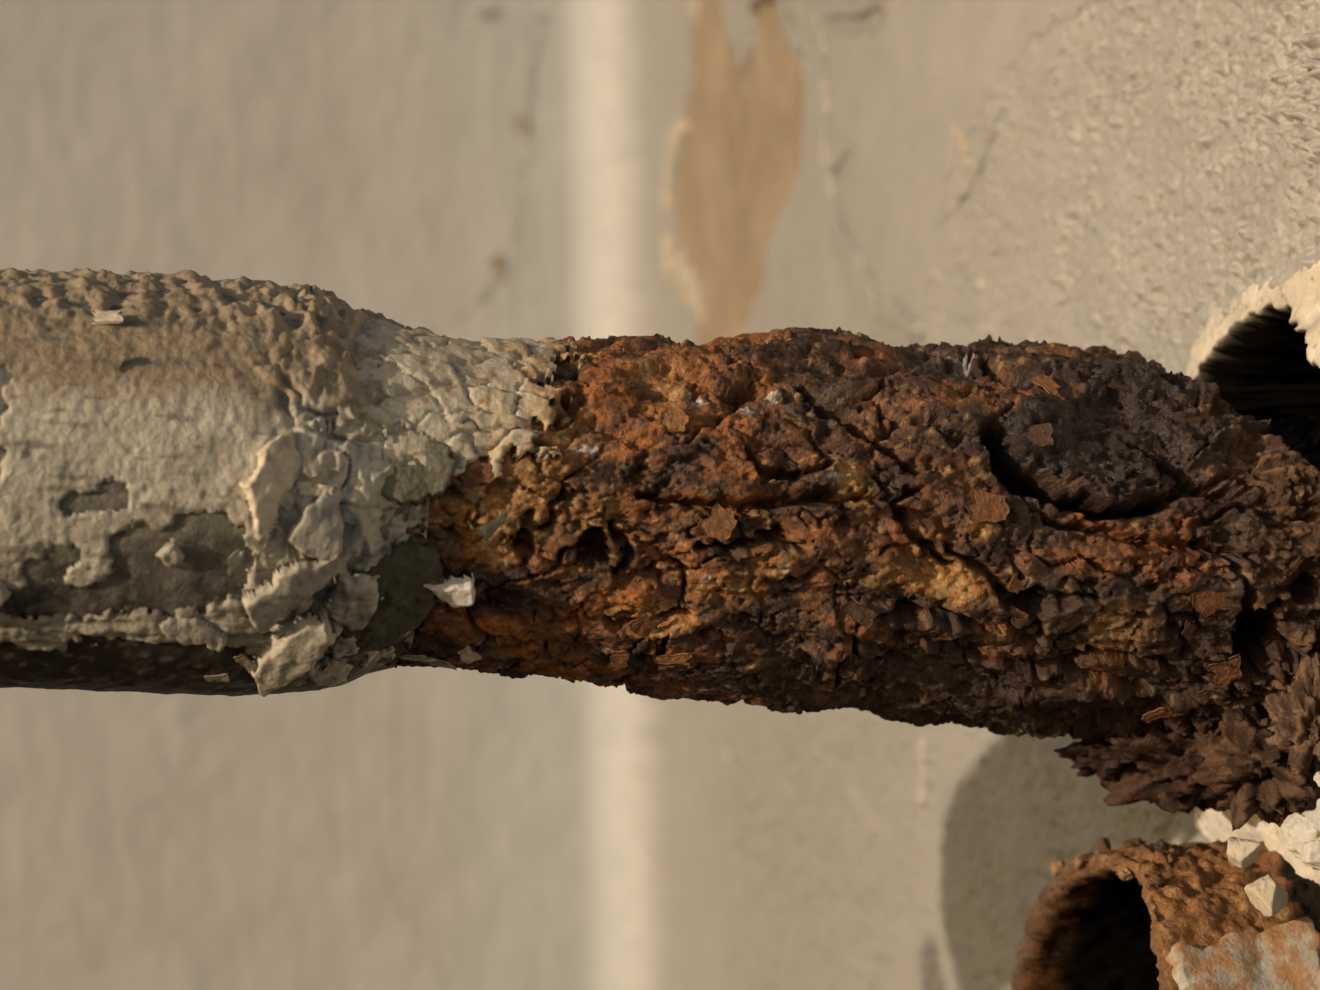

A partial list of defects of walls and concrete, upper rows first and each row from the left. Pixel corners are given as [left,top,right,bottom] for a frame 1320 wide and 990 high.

peeling [662,0,805,346]
crack [802,0,925,347]
crack [952,109,1004,211]
peeling [92,310,123,324]
peeling [337,404,354,421]
corrosion [1019,423,1054,447]
corrosion [697,503,737,542]
corrosion [965,490,1010,523]
peeling [155,430,482,697]
corrosion [1181,589,1231,637]
peeling [0,625,39,643]
corrosion [653,653,692,665]